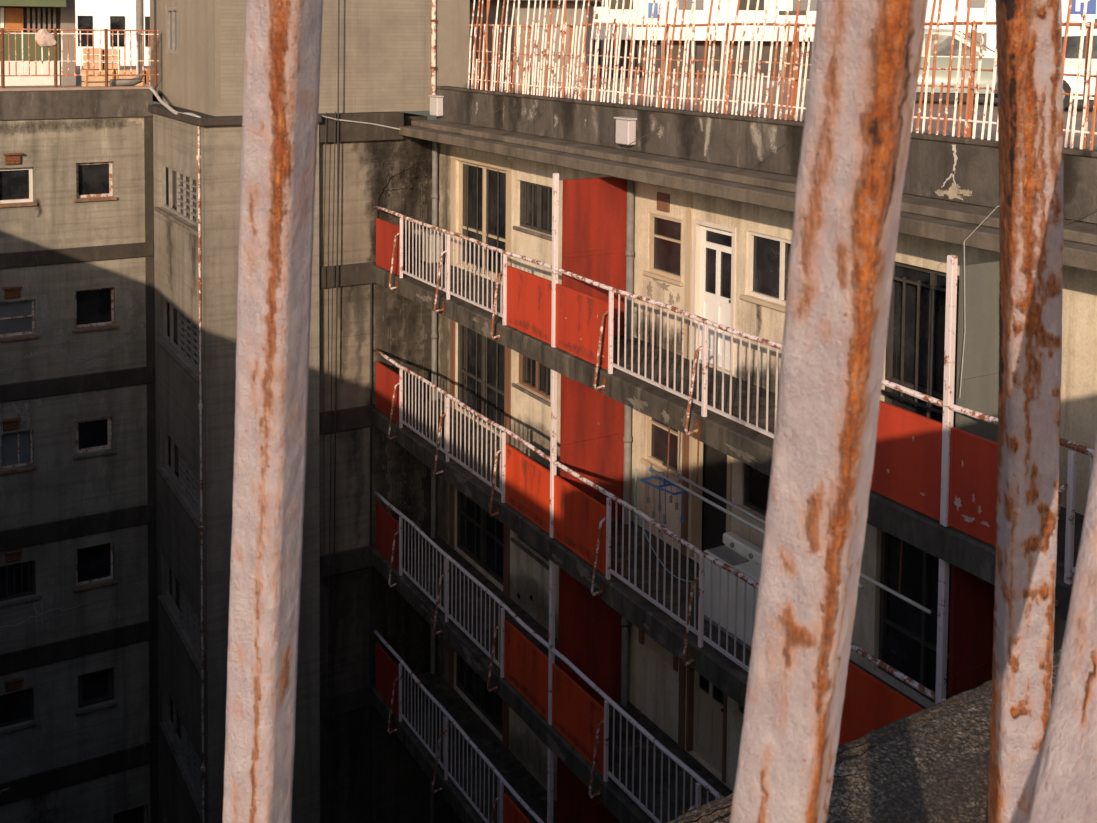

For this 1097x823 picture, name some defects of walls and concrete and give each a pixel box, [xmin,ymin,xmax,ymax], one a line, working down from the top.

damp [681,108,711,156]
damp [751,123,803,167]
peeling [954,494,990,527]